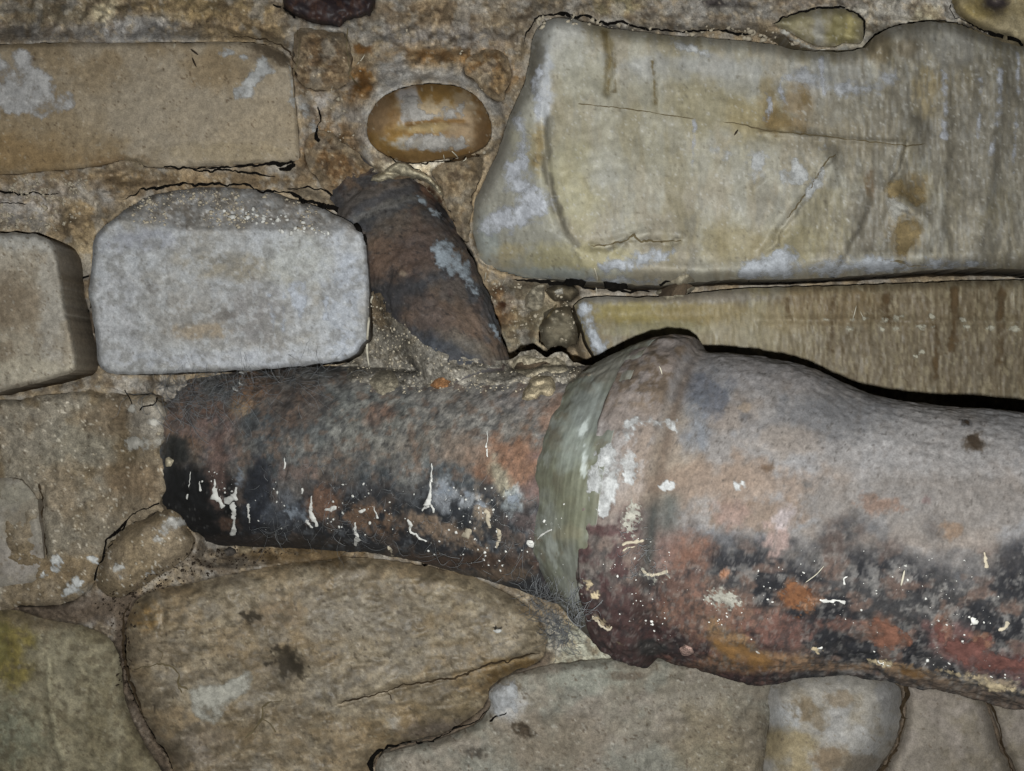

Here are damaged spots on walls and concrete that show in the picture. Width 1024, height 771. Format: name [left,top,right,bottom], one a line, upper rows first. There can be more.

crack [579,103,693,119]
crack [123,160,367,245]
leakage [624,416,677,439]
leakage [587,443,642,552]
leakage [658,480,675,491]
crack [94,503,159,581]
leakage [704,587,742,611]
crack [341,653,540,704]